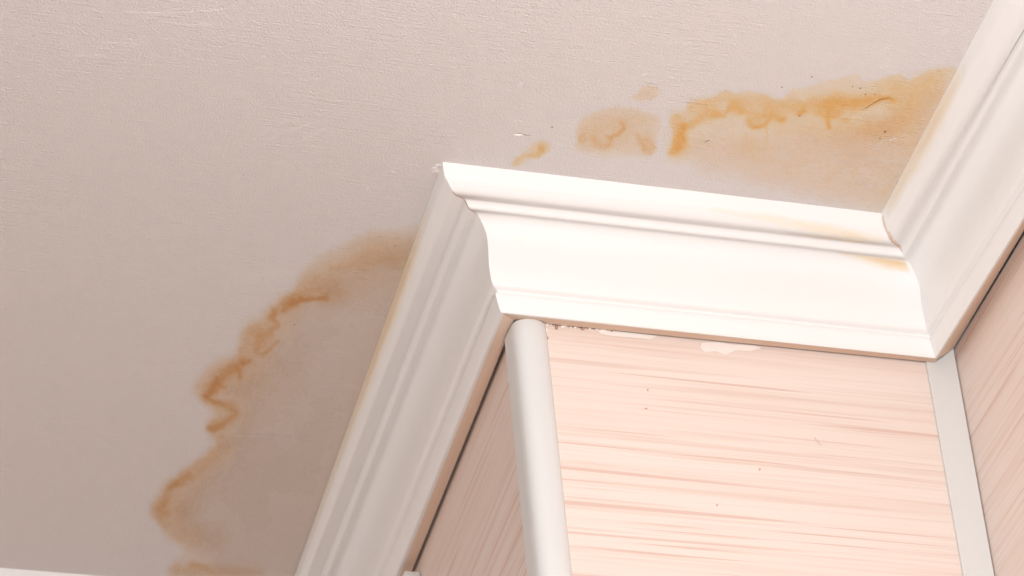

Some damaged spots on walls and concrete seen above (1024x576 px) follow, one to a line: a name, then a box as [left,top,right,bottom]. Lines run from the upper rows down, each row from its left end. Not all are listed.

water stain [509,139,553,169]
water stain [573,65,958,213]
water stain [147,223,420,576]